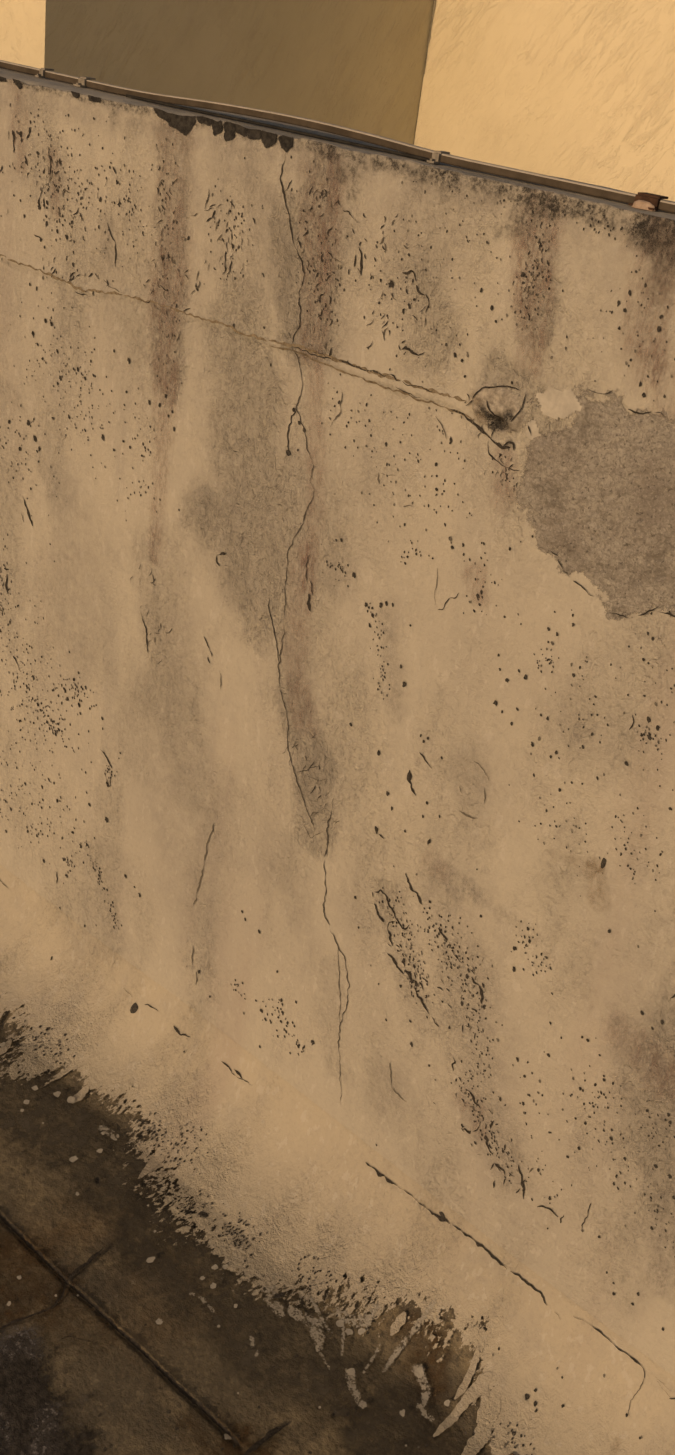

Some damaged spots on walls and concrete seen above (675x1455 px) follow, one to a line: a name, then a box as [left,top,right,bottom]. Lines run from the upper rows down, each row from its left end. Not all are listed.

crack [0,131,519,1104]
peeling [484,381,675,620]
damp [0,1075,463,1455]
crack [366,1163,675,1414]